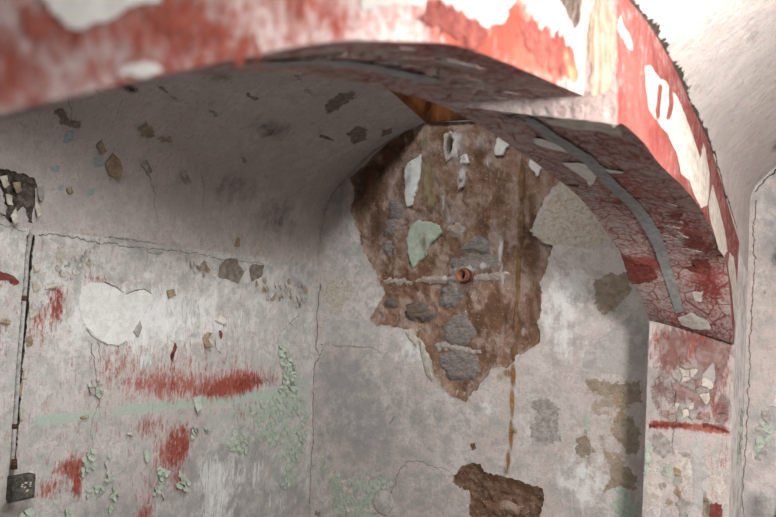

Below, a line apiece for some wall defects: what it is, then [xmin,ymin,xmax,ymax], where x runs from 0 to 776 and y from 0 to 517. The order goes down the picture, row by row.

peeling [45,0,162,30]
peeling [443,0,515,29]
peeling [111,61,163,93]
peeling [0,168,45,224]
crack [39,233,264,265]
flaking render [349,121,608,403]
crack [629,0,776,517]
peeling [0,235,93,459]
crack [279,283,379,503]
corrosion [504,365,515,473]
peeling [529,398,562,446]
flaking render [452,463,545,517]